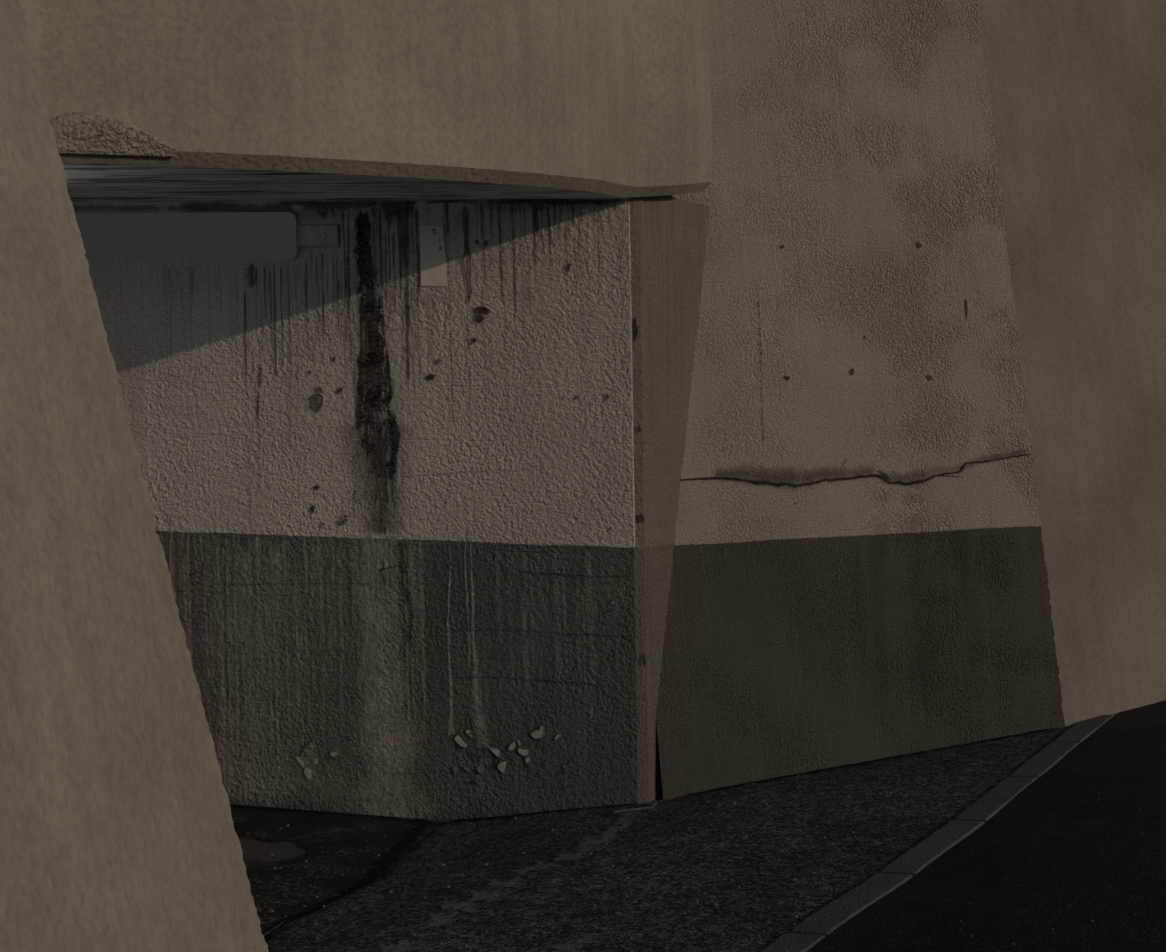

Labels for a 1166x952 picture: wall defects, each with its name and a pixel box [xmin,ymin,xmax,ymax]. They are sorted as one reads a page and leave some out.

crack [680,454,1031,488]
leakage [73,199,622,934]
peeling [294,741,338,779]
peeling [452,716,562,785]